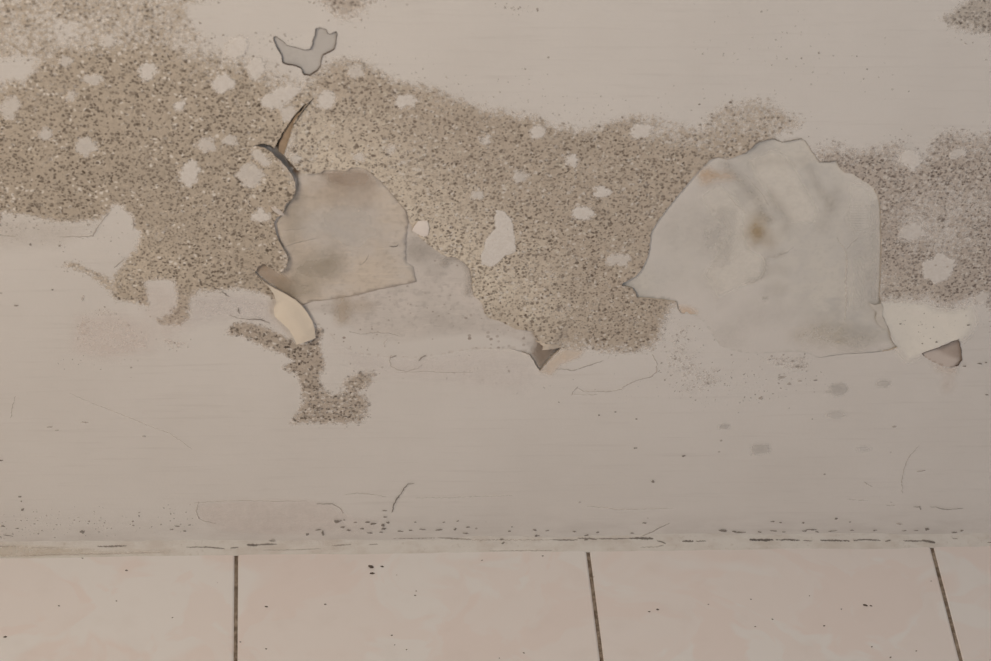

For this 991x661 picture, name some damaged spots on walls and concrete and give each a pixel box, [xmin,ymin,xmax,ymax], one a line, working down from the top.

peeling [273,28,337,76]
peeling [255,104,561,371]
peeling [622,139,897,357]
peeling [922,339,987,367]